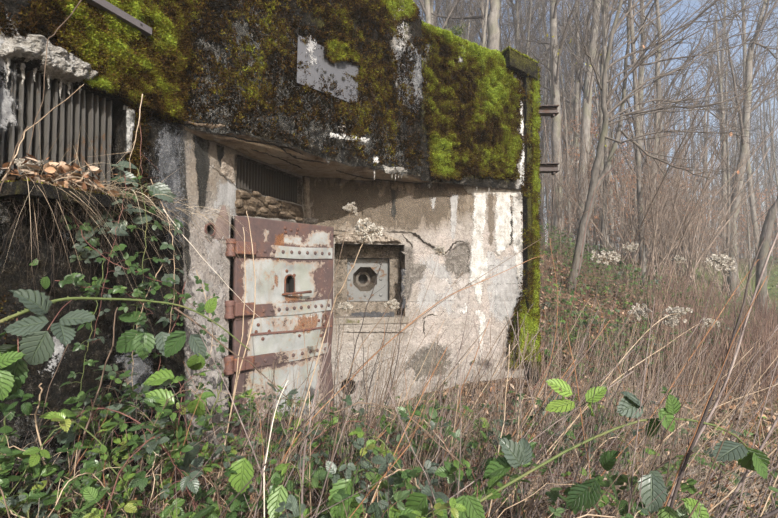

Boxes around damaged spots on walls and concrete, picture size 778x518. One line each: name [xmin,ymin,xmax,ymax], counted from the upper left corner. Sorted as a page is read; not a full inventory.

peeling [0,37,18,131]
damp [330,126,369,142]
damp [148,122,237,278]
corrosion [293,313,318,334]
spalling [334,228,472,319]
damp [302,146,525,360]
crack [386,231,470,348]